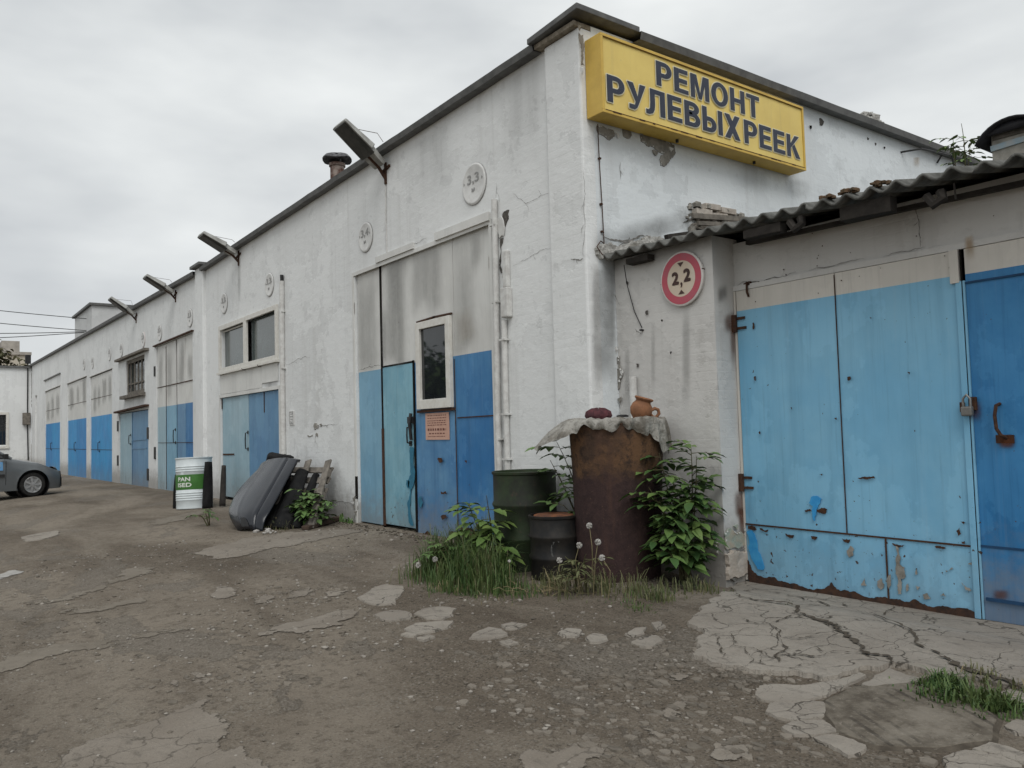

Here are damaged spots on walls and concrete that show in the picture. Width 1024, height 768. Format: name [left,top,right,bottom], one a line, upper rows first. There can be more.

peeling [596,126,676,167]
flaking render [497,210,509,277]
flaking render [694,524,765,582]
corrosion [747,543,977,619]